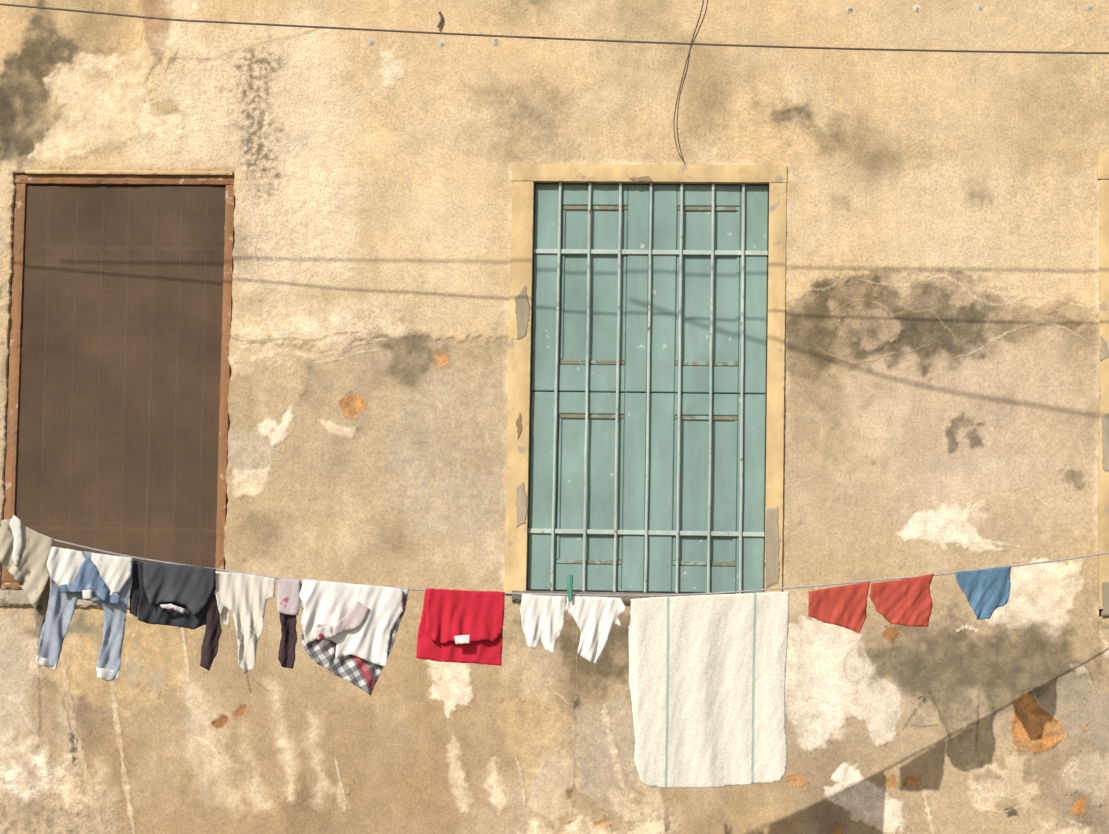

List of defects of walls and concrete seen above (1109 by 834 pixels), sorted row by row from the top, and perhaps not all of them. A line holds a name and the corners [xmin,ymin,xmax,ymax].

water stain [143,0,217,68]
water stain [0,0,84,174]
flaking render [227,405,296,501]
spalling [315,391,369,439]
water stain [784,255,1099,493]
peeling [1036,557,1064,581]
flaking render [822,761,923,834]
flaking render [960,666,1109,834]